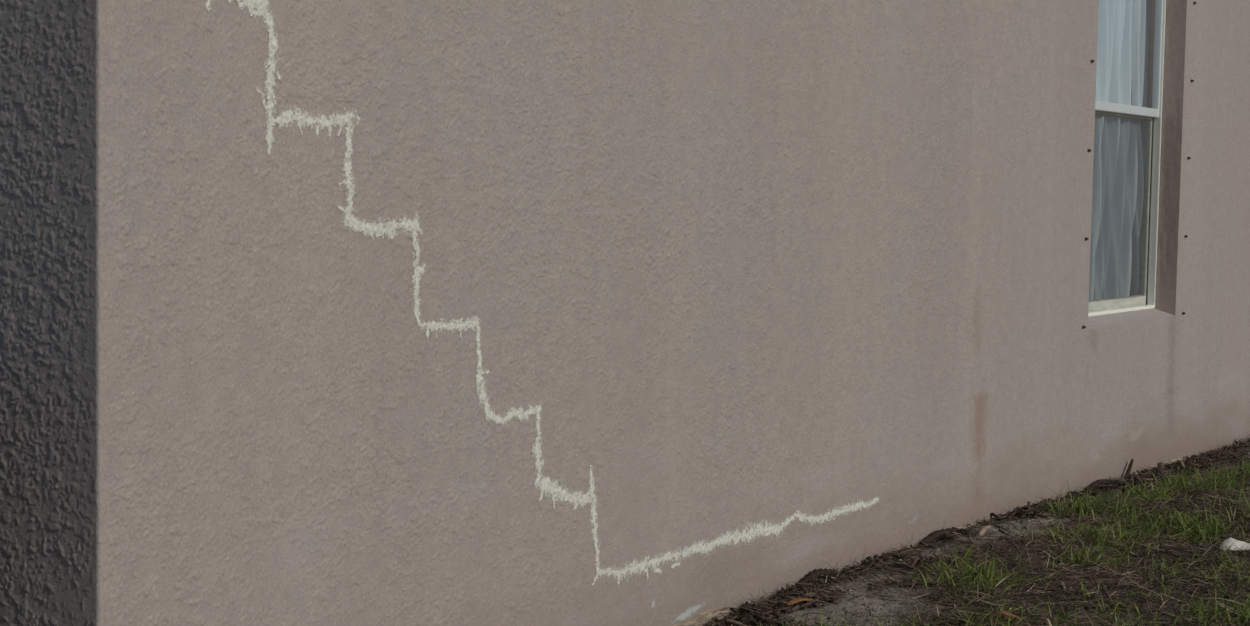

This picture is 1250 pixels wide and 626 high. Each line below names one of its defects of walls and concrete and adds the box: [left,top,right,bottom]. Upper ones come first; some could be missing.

crack [205,0,879,587]